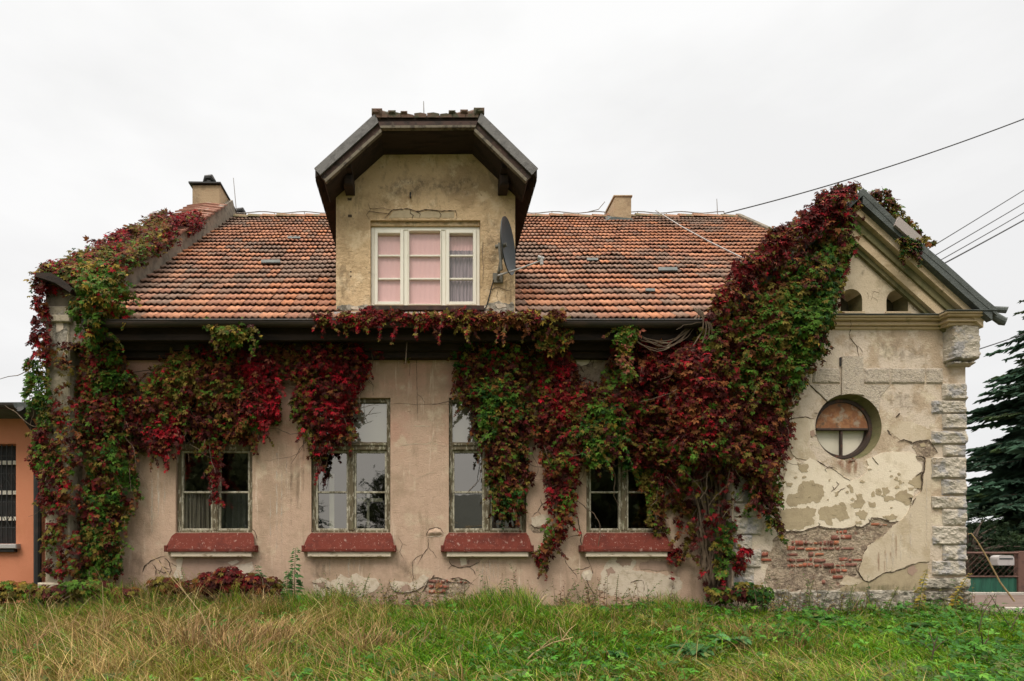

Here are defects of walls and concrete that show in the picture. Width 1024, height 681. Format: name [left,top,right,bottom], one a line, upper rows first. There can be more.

crack [367,204,457,218]
peeling [761,414,937,593]
crack [785,413,938,582]
peeling [312,558,482,598]
crack [389,539,481,594]
peeling [581,557,682,597]